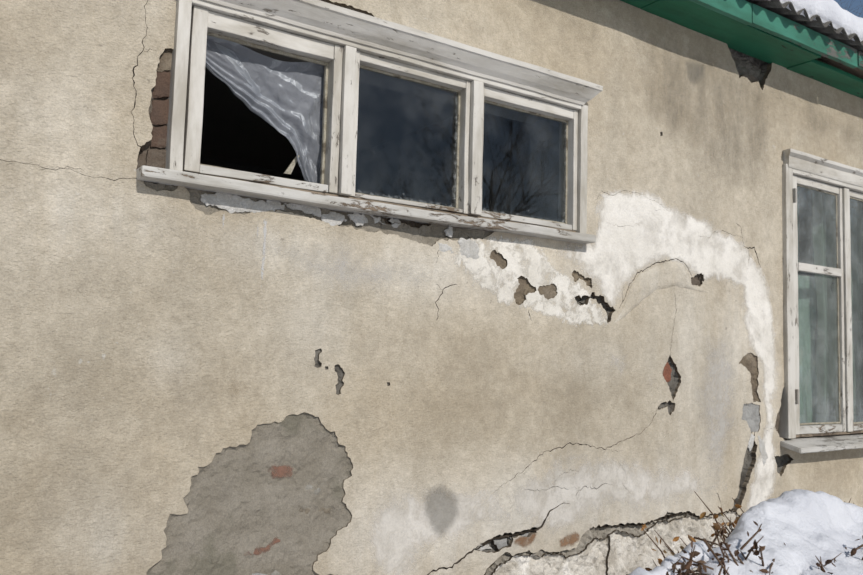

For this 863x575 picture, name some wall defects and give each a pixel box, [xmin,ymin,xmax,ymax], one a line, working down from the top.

crack [131,0,155,147]
spalling [136,48,174,170]
crack [3,160,131,181]
spalling [143,181,494,259]
spalling [514,276,557,305]
spalling [572,270,616,323]
crack [620,258,692,306]
spalling [146,412,353,575]
crack [427,414,656,575]
spalling [474,353,761,575]
crack [599,493,733,575]
crack [747,427,774,465]